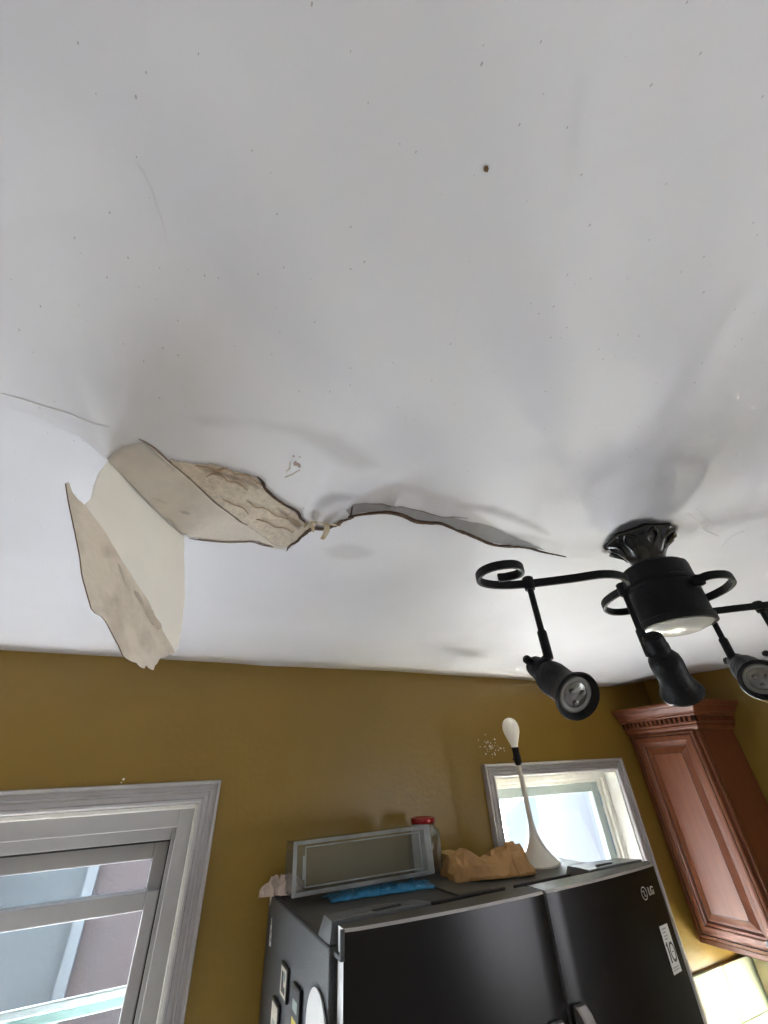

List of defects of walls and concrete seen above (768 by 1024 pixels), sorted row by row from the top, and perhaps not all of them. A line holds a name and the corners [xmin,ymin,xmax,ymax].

spalling [170,459,341,548]
crack [139,439,566,557]
peeling [65,461,185,670]